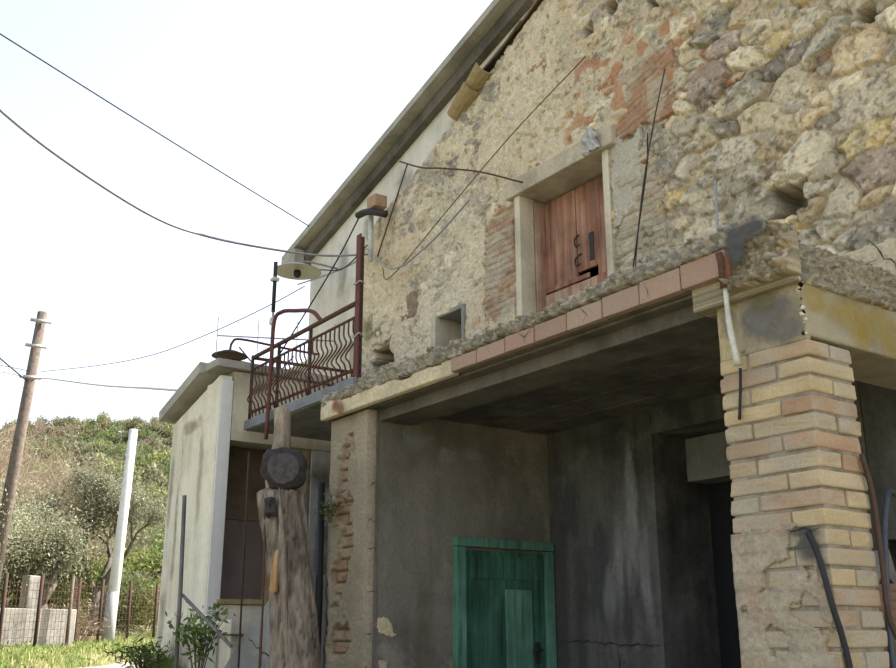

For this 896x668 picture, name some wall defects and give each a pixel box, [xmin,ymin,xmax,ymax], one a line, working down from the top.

crack [868,242,896,267]
flaking render [323,409,396,668]
flaking render [731,522,839,668]